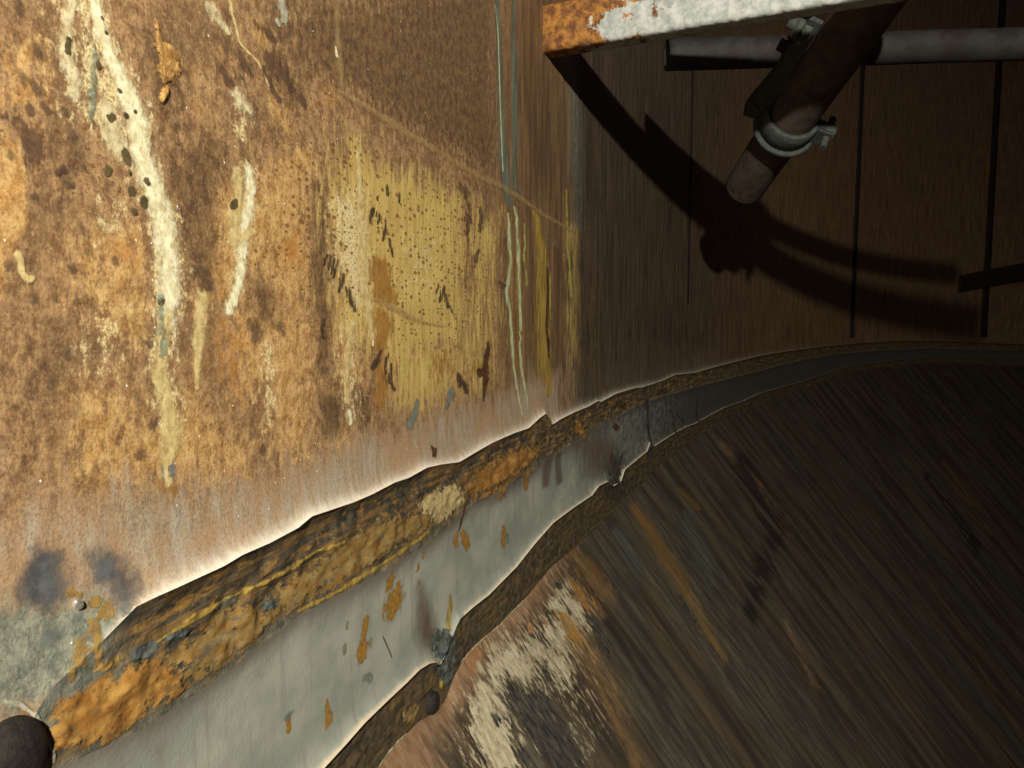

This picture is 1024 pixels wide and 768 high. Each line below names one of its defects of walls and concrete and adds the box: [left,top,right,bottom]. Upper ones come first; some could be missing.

leakage [59,0,184,487]
leakage [225,165,256,315]
leakage [344,137,375,426]
leakage [494,0,552,417]
corrosion [45,443,541,750]